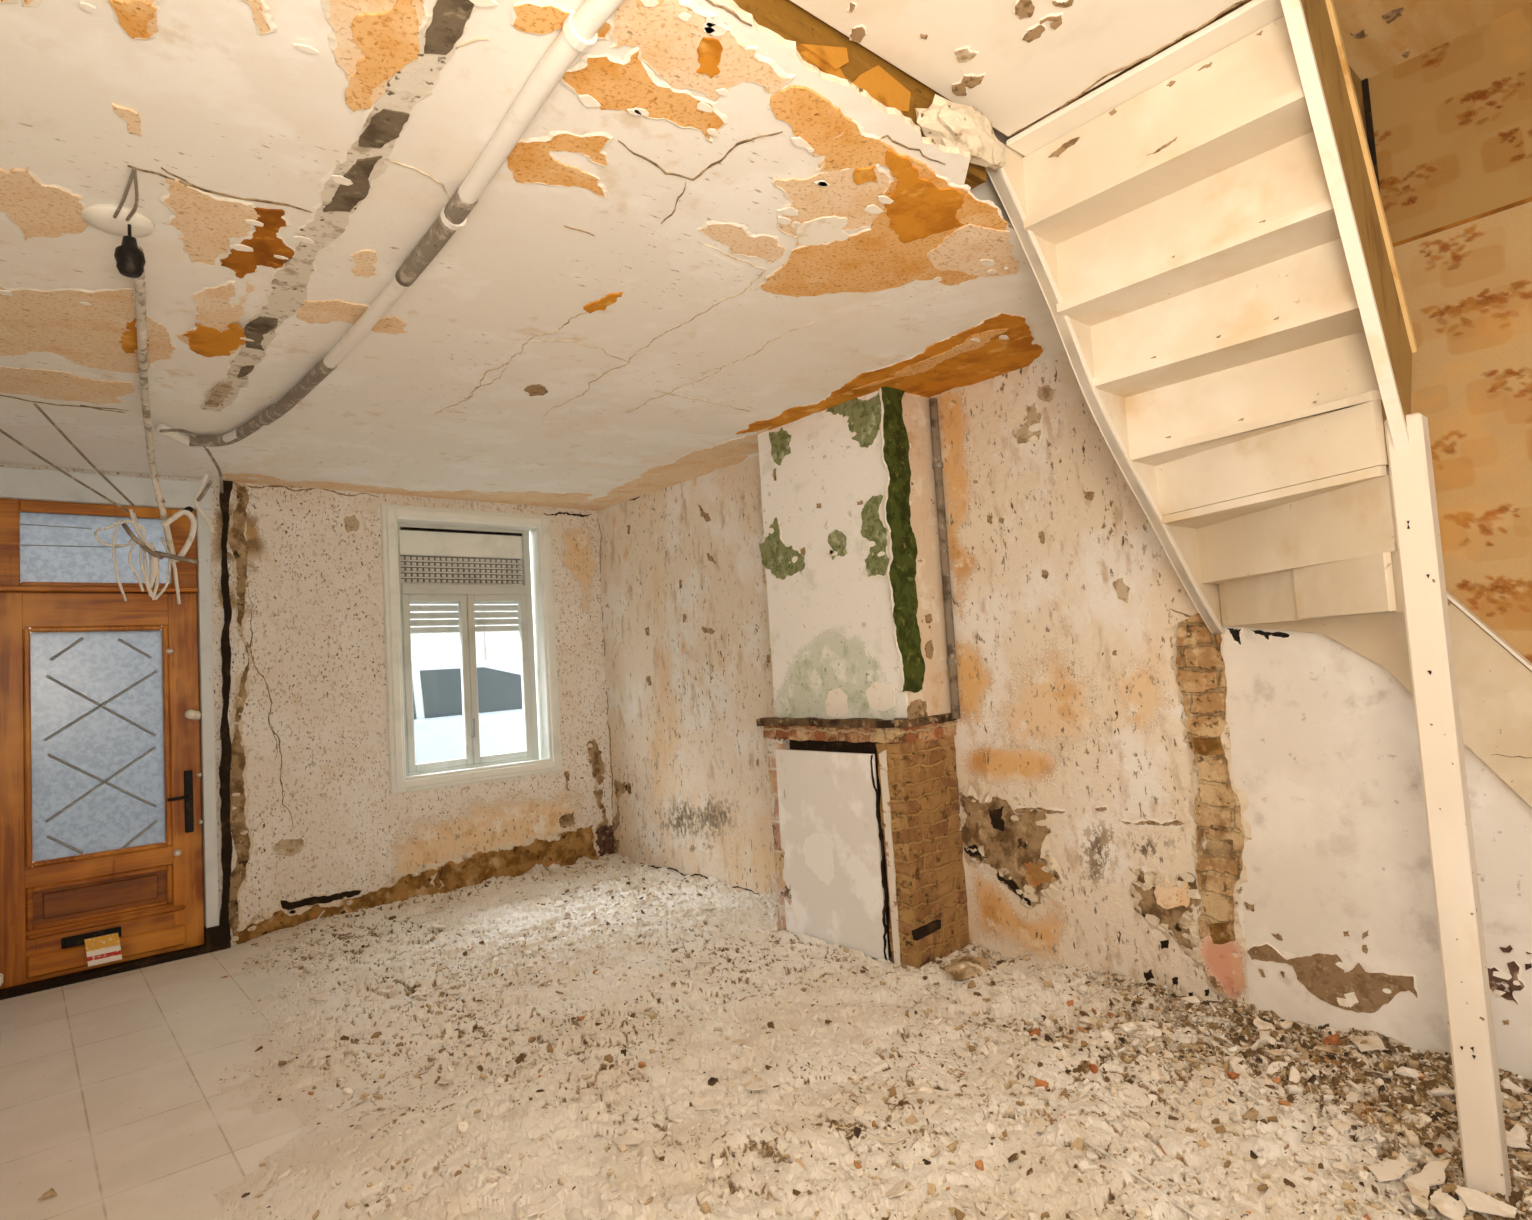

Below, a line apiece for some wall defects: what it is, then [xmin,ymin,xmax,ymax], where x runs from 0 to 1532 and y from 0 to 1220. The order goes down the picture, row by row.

peeling [293,0,437,130]
peeling [505,131,614,199]
crack [618,131,783,224]
peeling [559,0,1019,297]
peeling [0,165,378,404]
crack [435,241,766,416]
crack [626,322,816,413]
crack [248,590,293,824]
peeling [217,311,1046,945]
water stain [775,629,896,720]
spalling [958,785,1063,910]
peeling [1129,613,1419,1014]